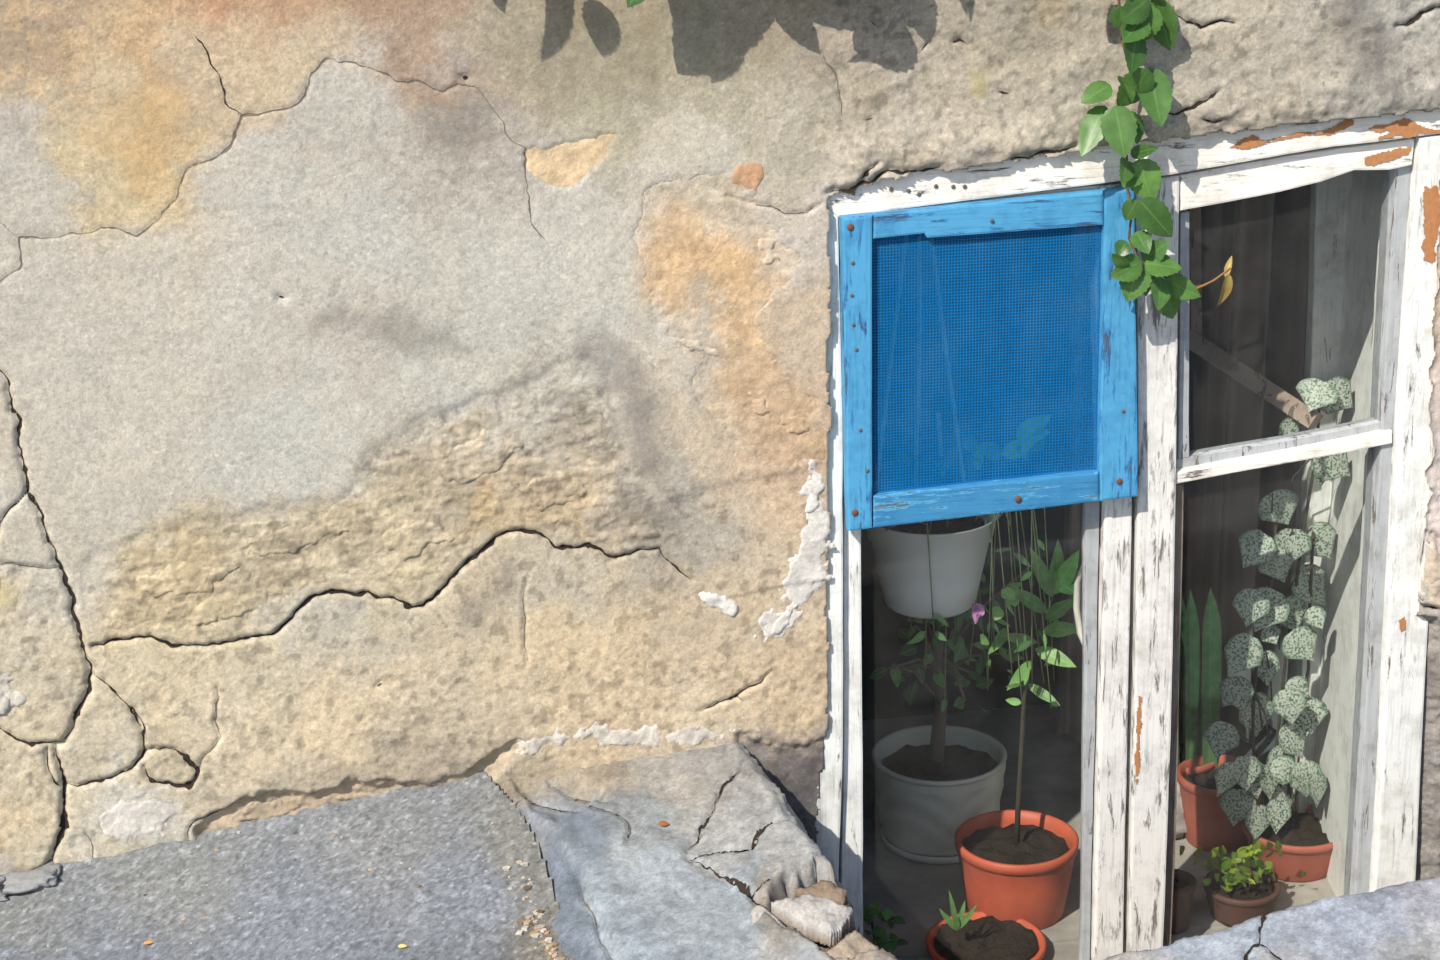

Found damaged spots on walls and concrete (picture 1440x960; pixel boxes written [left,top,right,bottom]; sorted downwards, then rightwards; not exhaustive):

crack [1400,6,1440,26]
crack [0,34,544,282]
spalling [525,134,617,187]
crack [1168,91,1221,123]
peeling [1230,118,1440,166]
spalling [633,163,836,643]
spalling [1421,180,1440,610]
spalling [103,365,660,639]
crack [0,370,691,858]
spalling [194,740,522,837]
crack [687,764,789,926]
crack [1244,915,1282,960]